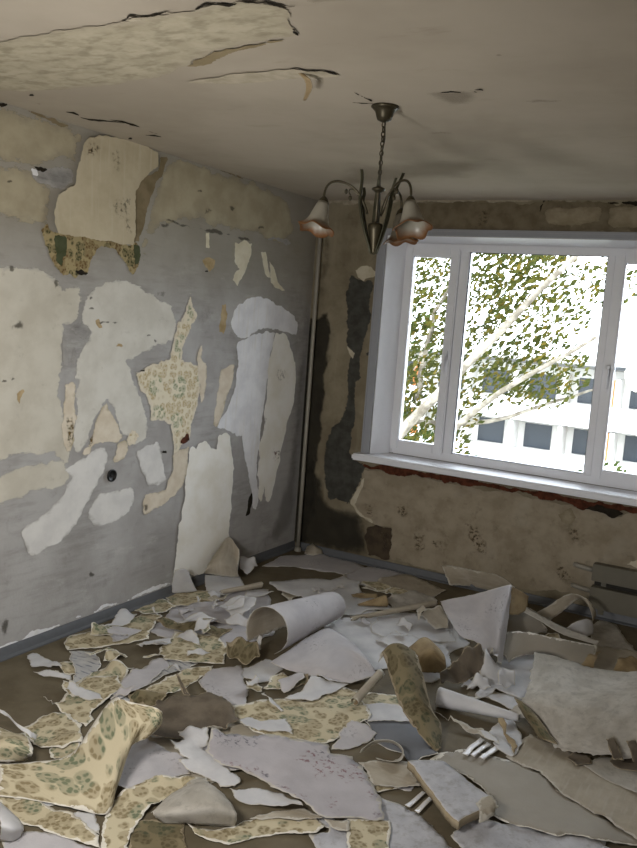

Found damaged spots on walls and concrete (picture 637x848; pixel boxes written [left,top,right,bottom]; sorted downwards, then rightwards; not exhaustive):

peeling [0,0,299,92]
peeling [189,68,339,101]
crack [608,199,637,207]
peeling [261,252,284,291]
flaking render [62,321,89,366]
peeling [197,346,207,402]
peeling [257,333,296,502]
peeling [324,266,637,518]
peeling [143,447,189,514]